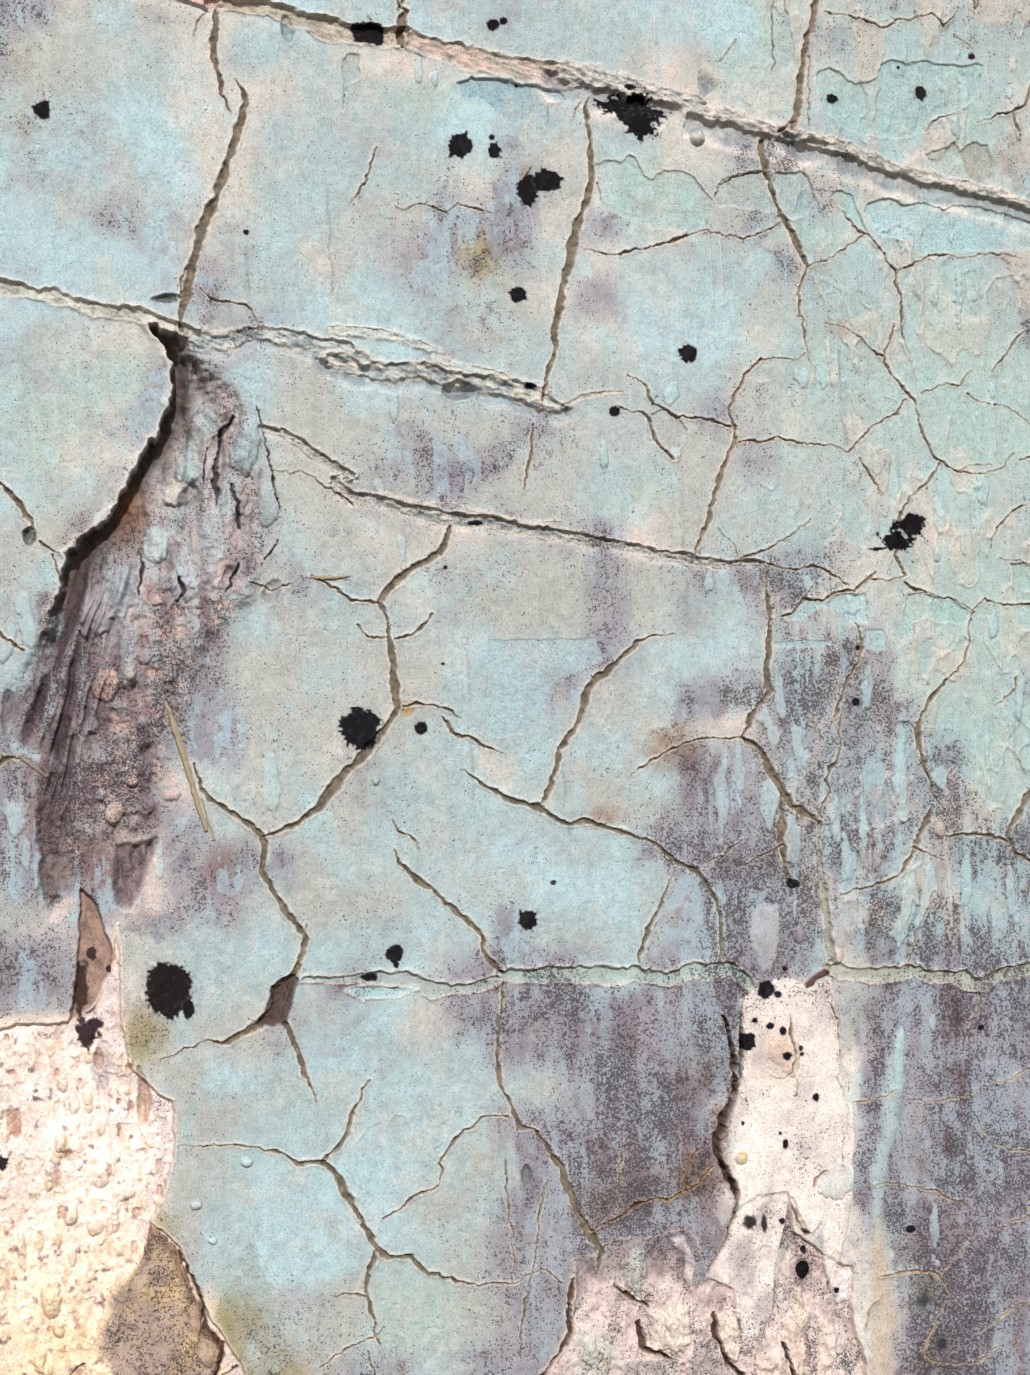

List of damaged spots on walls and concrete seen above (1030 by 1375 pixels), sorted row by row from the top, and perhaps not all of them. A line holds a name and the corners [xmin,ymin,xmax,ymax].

spalling [150,293,179,305]
crack [0,0,1030,1042]
spalling [0,323,286,1375]
crack [161,1017,318,1103]
spalling [255,974,299,1028]
crack [178,1080,565,1375]
spalling [521,1164,533,1189]
crack [301,634,757,1276]
crack [613,1283,650,1309]
flaking render [540,969,868,1375]
crack [853,1068,1030,1154]
crack [865,1182,1030,1367]